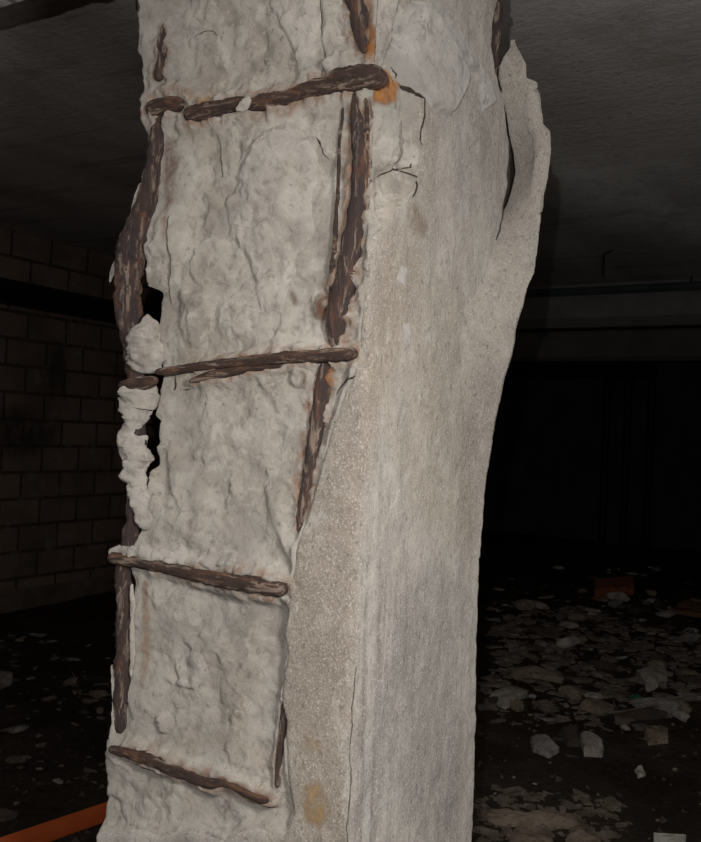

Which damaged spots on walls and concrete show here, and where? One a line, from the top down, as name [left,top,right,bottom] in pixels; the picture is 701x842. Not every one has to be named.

rust [373,70,398,104]
crack [391,67,426,145]
crack [377,163,418,197]
spalling [99,0,504,842]